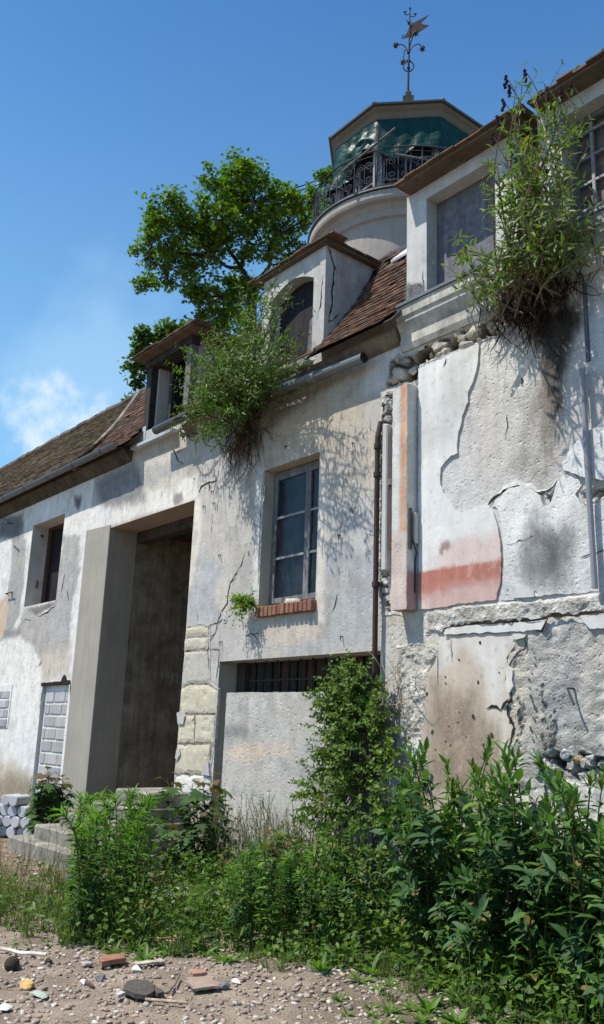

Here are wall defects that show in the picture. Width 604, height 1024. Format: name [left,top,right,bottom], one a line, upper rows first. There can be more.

crack [317,245,340,322]
crack [186,472,265,676]
peeling [349,300,604,814]
water stain [520,516,571,584]
water stain [430,687,497,786]